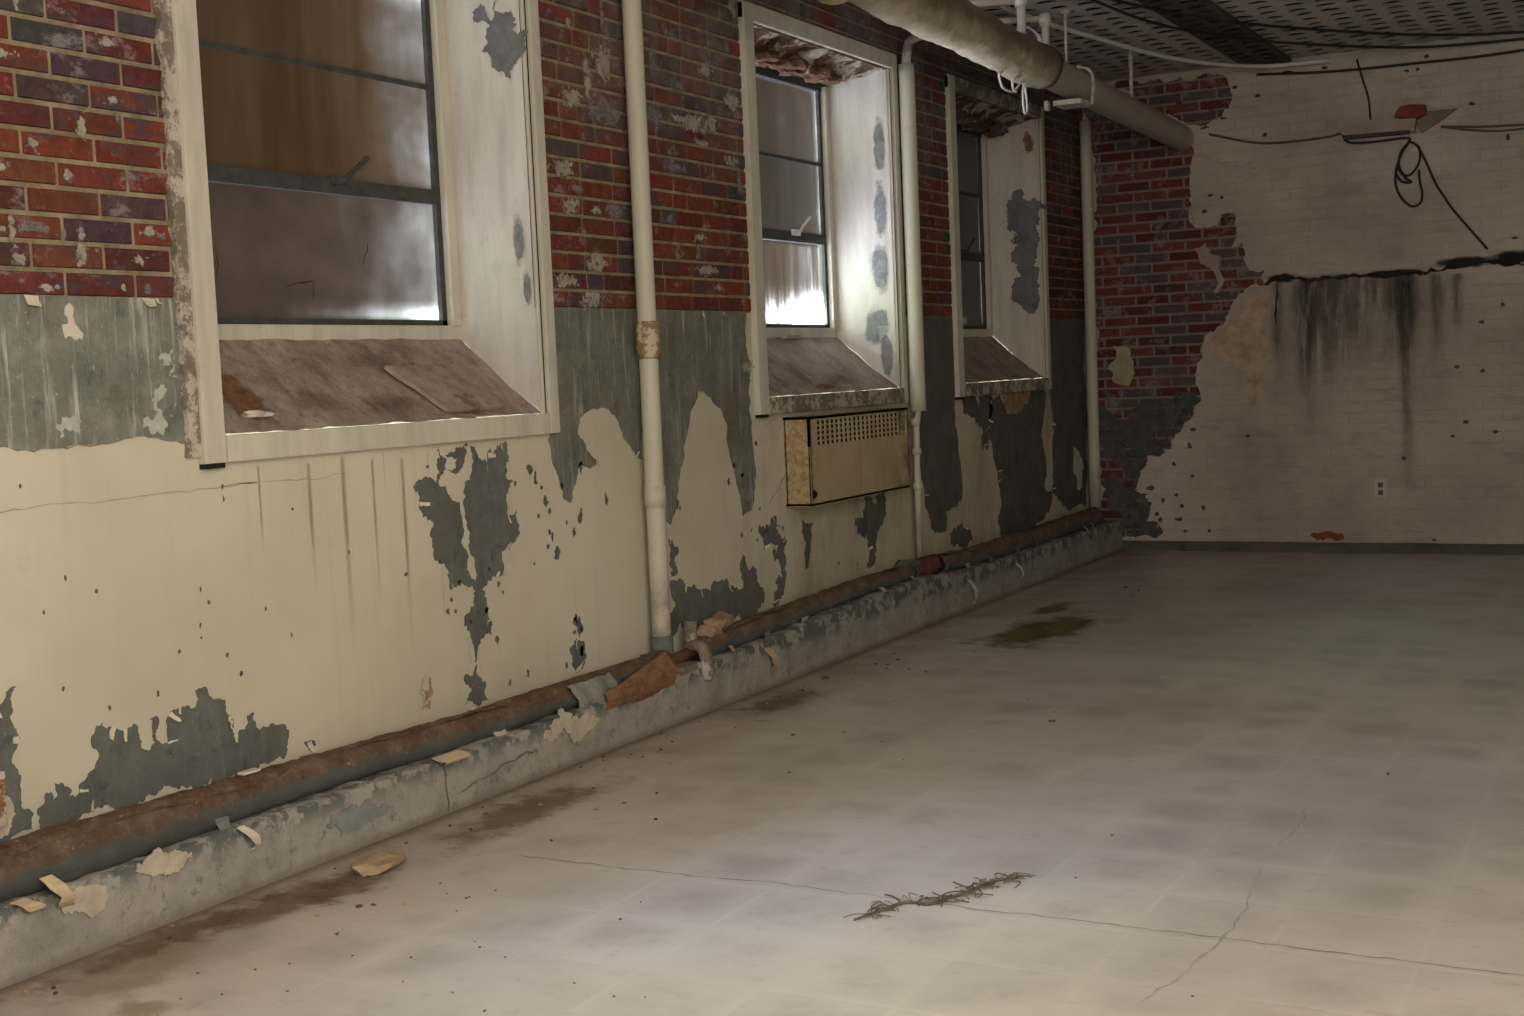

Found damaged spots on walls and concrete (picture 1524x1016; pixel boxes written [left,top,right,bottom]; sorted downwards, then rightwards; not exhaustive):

peeling [0,295,187,451]
peeling [920,107,1264,549]
damp [1270,273,1316,331]
damp [1366,269,1421,307]
damp [1438,251,1524,267]
peeling [413,308,642,710]
peeling [656,310,813,636]
peeling [0,686,316,843]
corrosion [420,674,433,709]
damp [997,617,1088,643]
crack [513,854,908,901]
crack [946,805,1521,1005]